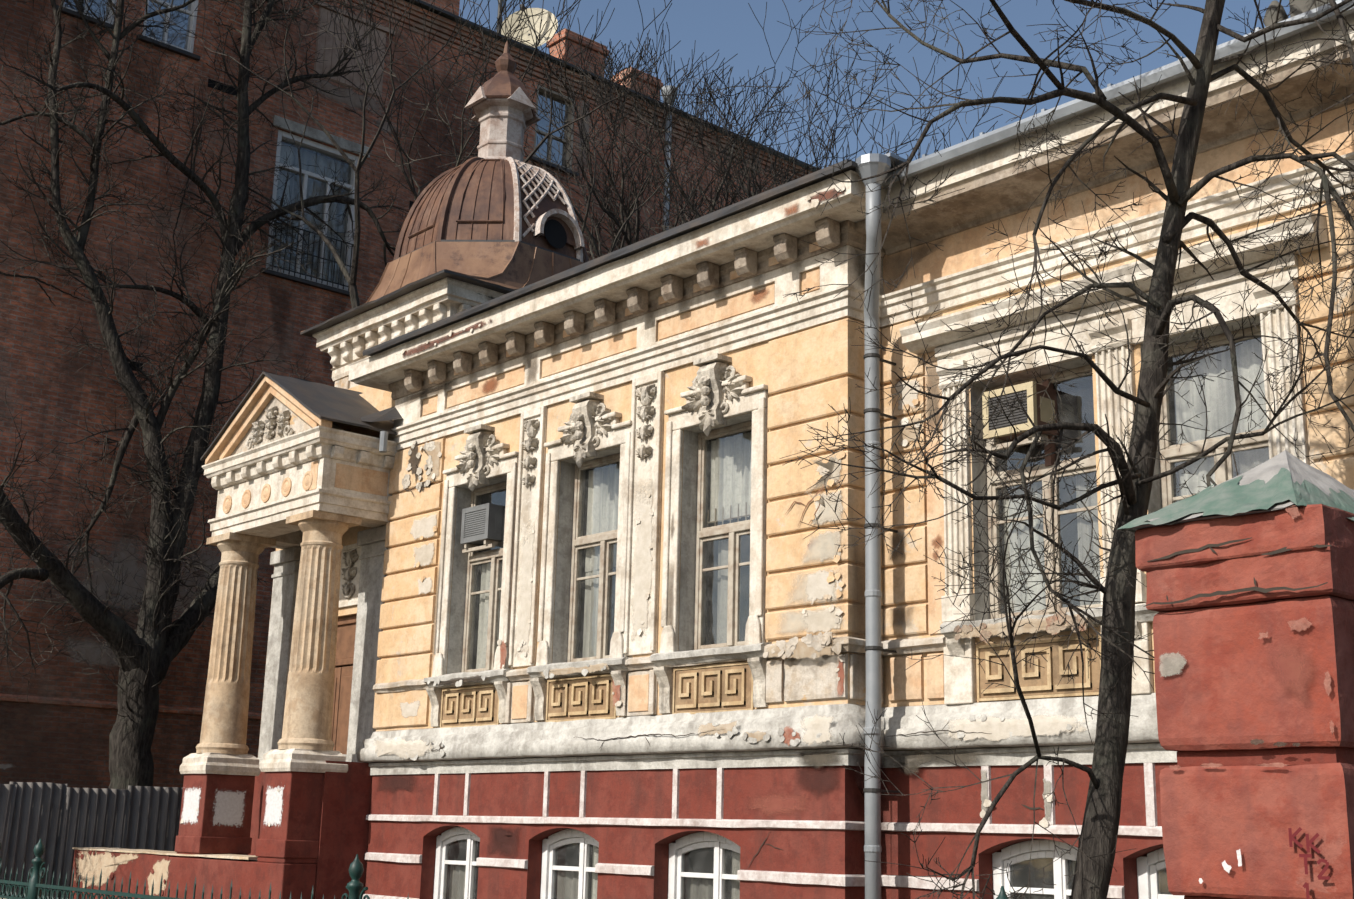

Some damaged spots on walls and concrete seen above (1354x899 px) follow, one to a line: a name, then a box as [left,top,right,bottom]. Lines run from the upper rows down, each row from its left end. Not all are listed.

spalling [402,440,442,492]
flaking render [763,450,845,696]
crack [1143,537,1331,607]
spalling [1159,653,1186,677]
flaking render [374,736,444,761]
spalling [698,714,833,747]
peeling [74,848,138,888]
peeling [147,859,170,895]